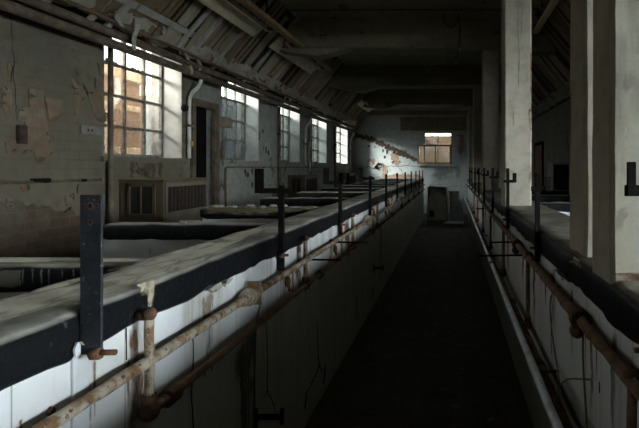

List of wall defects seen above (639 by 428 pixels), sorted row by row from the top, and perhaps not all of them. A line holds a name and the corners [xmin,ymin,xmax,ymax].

spalling [52,0,422,179]
flaking render [5,88,65,162]
flaking render [0,200,80,261]
rust [127,329,139,367]
rust [127,375,144,428]